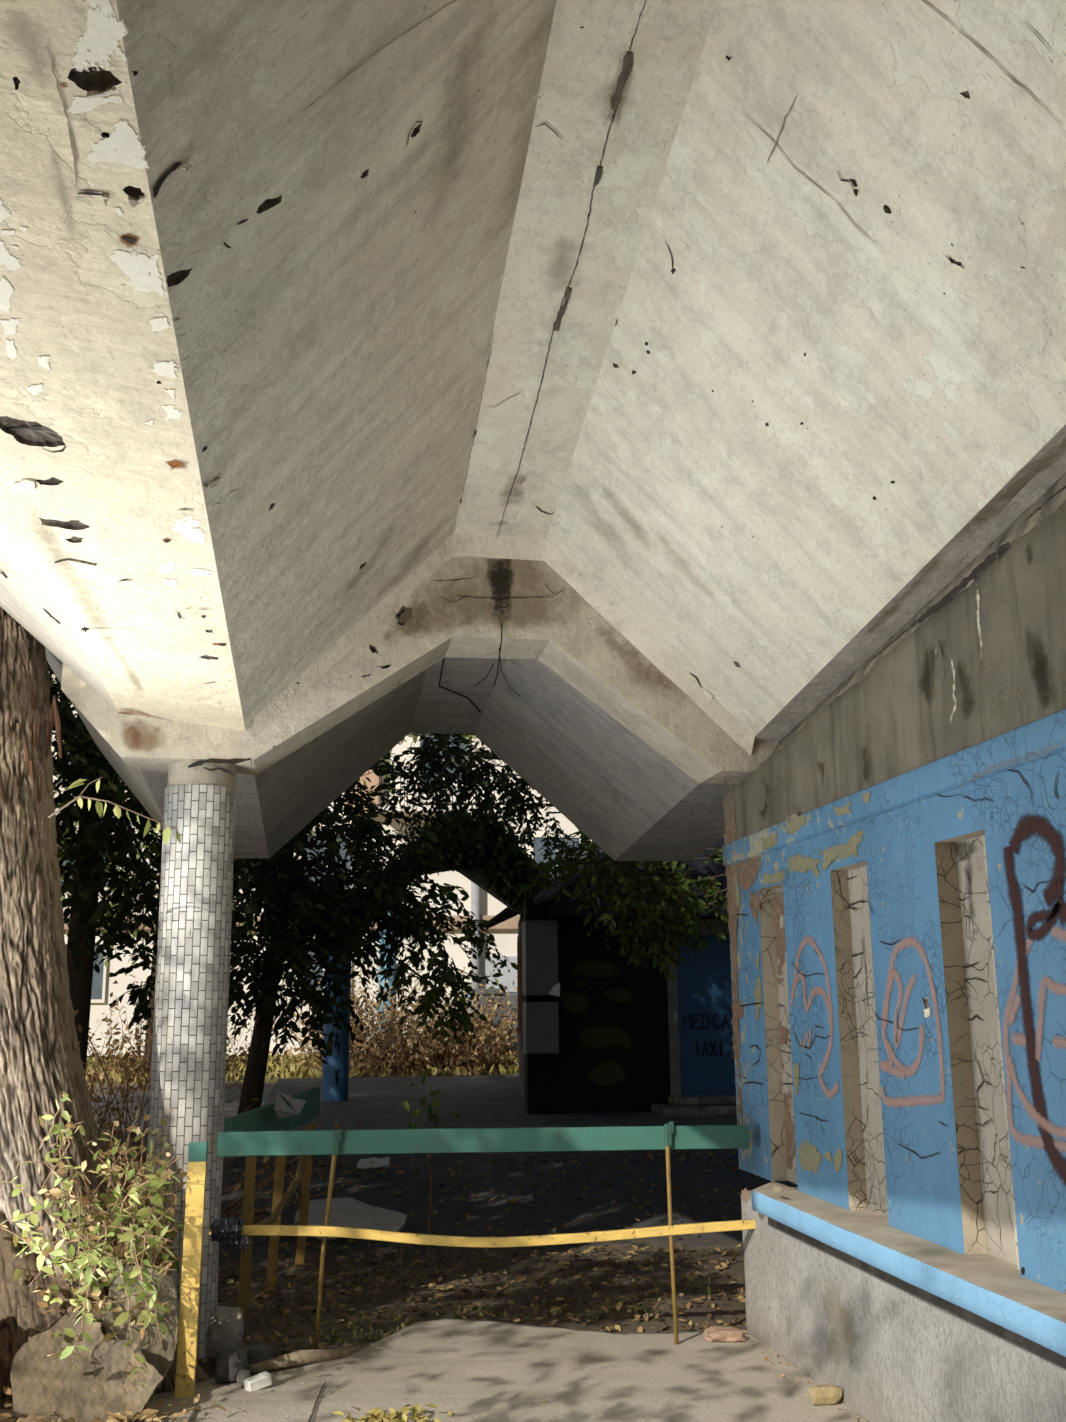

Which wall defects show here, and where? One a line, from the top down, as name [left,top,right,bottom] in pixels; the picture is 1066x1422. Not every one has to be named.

peeling [60,0,138,114]
crack [922,0,1062,125]
spalling [113,186,144,216]
crack [750,97,891,243]
crack [460,0,646,538]
spalling [0,416,66,453]
spalling [38,517,90,543]
water stain [401,559,547,629]
water stain [921,646,971,719]
peeling [725,814,864,1125]
crack [738,876,920,1134]
crack [859,866,992,1162]